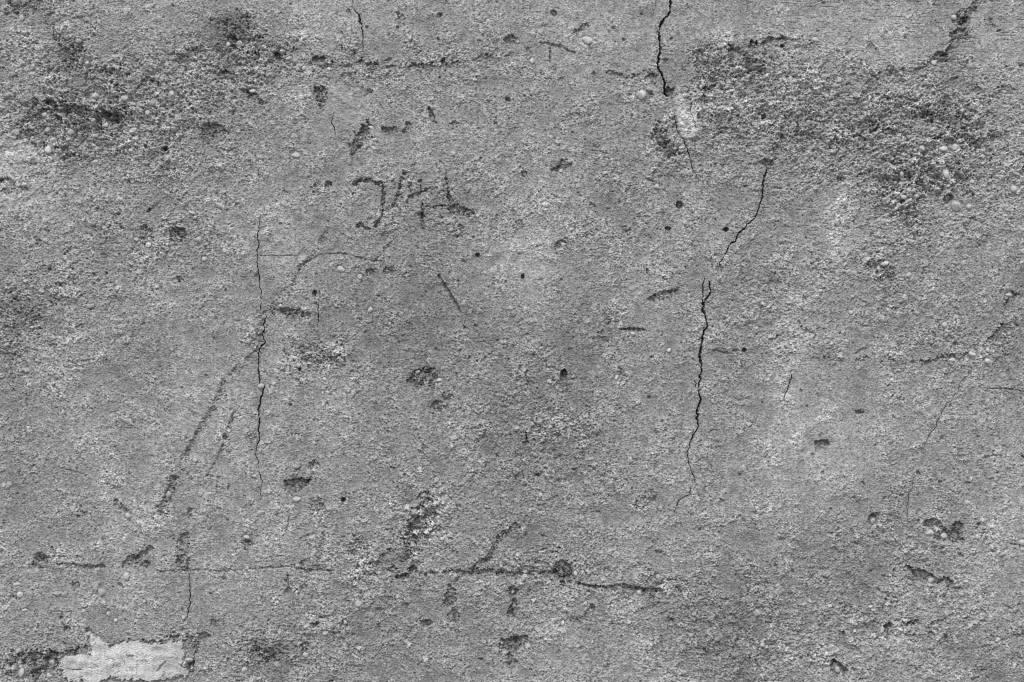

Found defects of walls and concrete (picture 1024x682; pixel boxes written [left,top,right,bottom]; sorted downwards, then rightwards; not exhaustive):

crack [652,0,701,187]
crack [235,213,291,501]
crack [673,167,769,514]